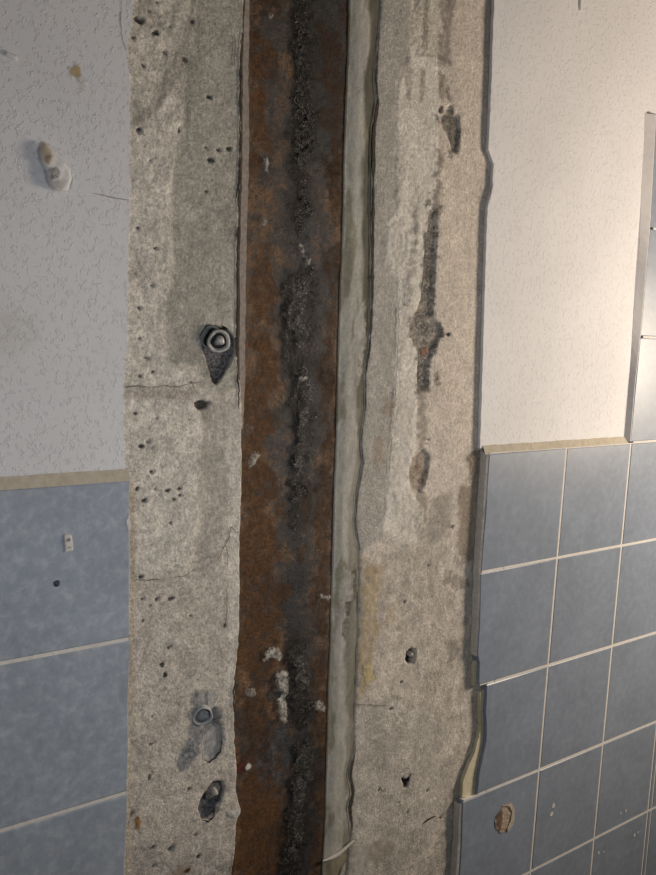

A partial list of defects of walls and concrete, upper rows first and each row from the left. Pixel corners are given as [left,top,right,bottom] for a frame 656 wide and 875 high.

spalling [406,74,460,411]
crack [356,36,380,550]
spalling [202,327,234,384]
spalling [410,421,429,532]
water stain [467,451,481,475]
peeling [264,647,282,661]
peeling [277,695,287,722]
spalling [198,781,222,823]
corrosion [237,760,251,774]
crack [348,751,356,830]